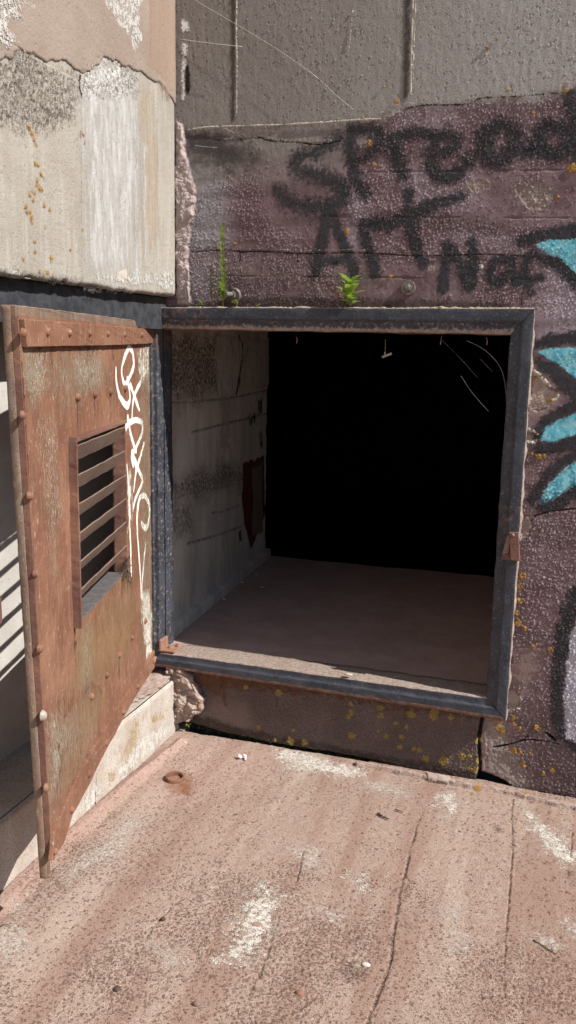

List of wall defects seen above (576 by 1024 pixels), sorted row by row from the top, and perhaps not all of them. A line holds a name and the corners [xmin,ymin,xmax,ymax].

flaking render [0,0,191,138]
damp [80,62,148,285]
crack [193,248,523,262]
peeling [239,398,265,548]
crack [493,736,554,748]
crack [367,819,420,1024]